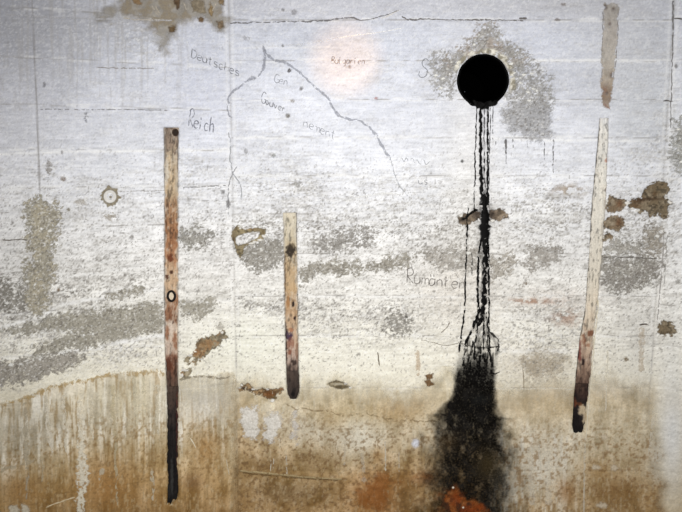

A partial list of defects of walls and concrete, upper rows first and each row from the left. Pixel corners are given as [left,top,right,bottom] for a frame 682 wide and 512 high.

peeling [231,225,284,275]
spalling [458,211,480,225]
leakage [458,108,500,374]
spalling [489,208,508,222]
peeling [600,181,673,300]
spalling [657,320,677,337]
spalling [180,330,228,378]
spalling [238,383,284,402]
leakage [0,371,455,512]
leakage [494,351,665,512]
corrosion [443,487,483,512]